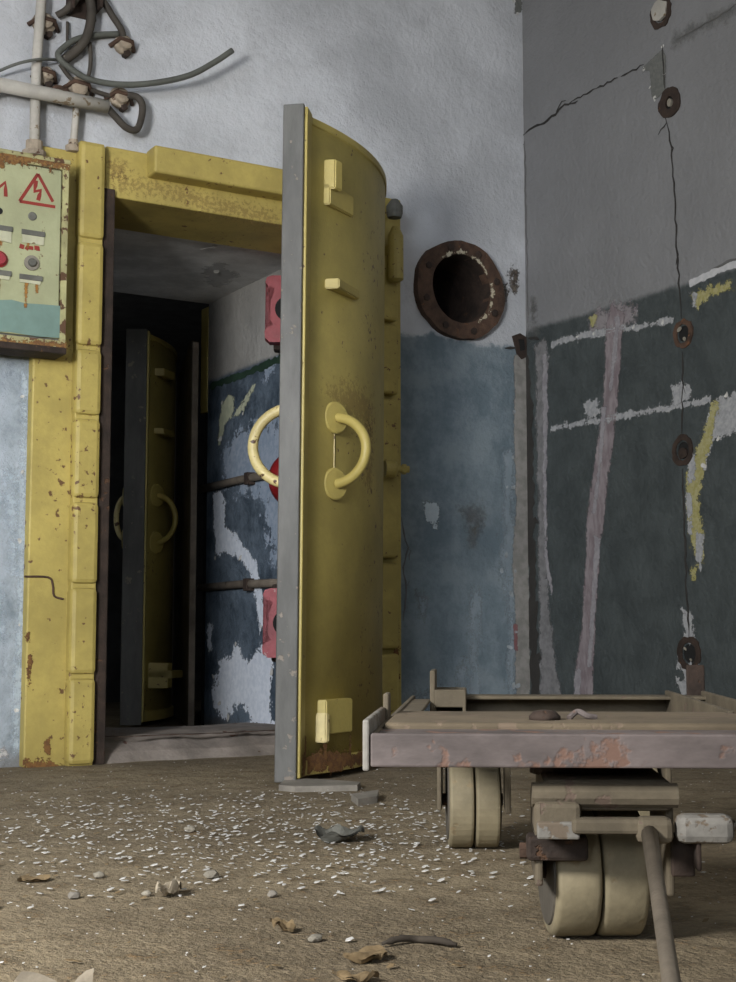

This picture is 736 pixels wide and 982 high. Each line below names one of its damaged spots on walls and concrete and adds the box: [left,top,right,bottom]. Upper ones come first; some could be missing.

rust [0,153,72,174]
crack [658,118,682,319]
peeling [217,356,278,445]
crack [523,64,644,694]
flaking render [500,317,686,694]
peeling [550,381,736,581]
peeling [205,622,213,652]
peeling [211,490,275,724]
peeling [675,607,696,695]
rust [302,736,363,777]